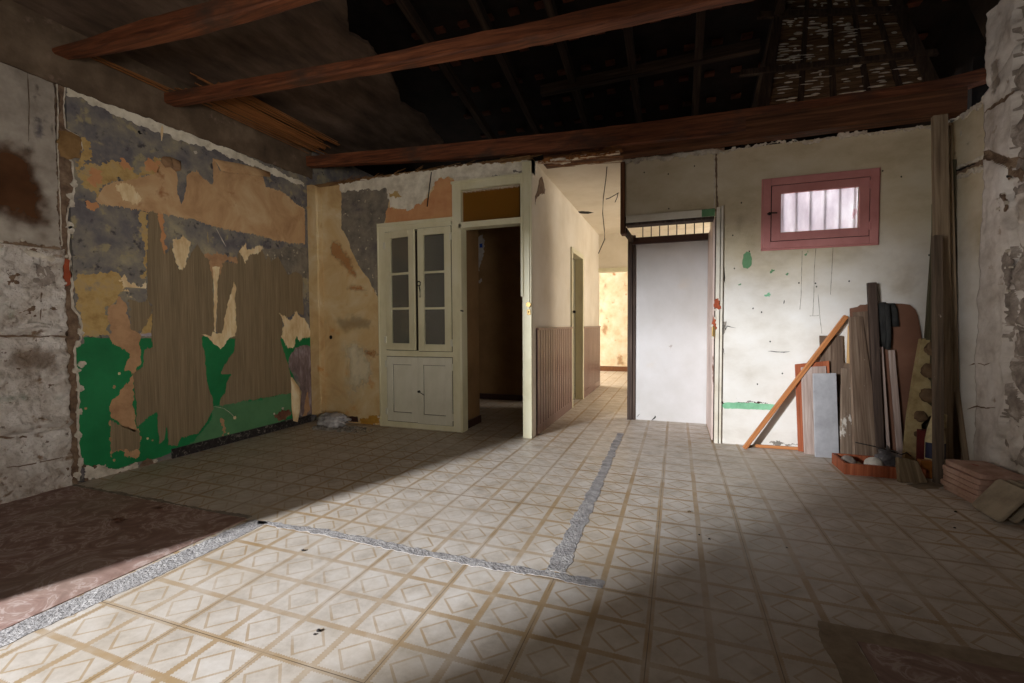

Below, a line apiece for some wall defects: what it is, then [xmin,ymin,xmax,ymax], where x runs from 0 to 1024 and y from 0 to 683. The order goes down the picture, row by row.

peeling [75,137,181,211]
flaking render [66,88,304,186]
flaking render [339,125,931,296]
spalling [996,193,1009,212]
spalling [1001,249,1014,292]
peeling [74,271,310,481]